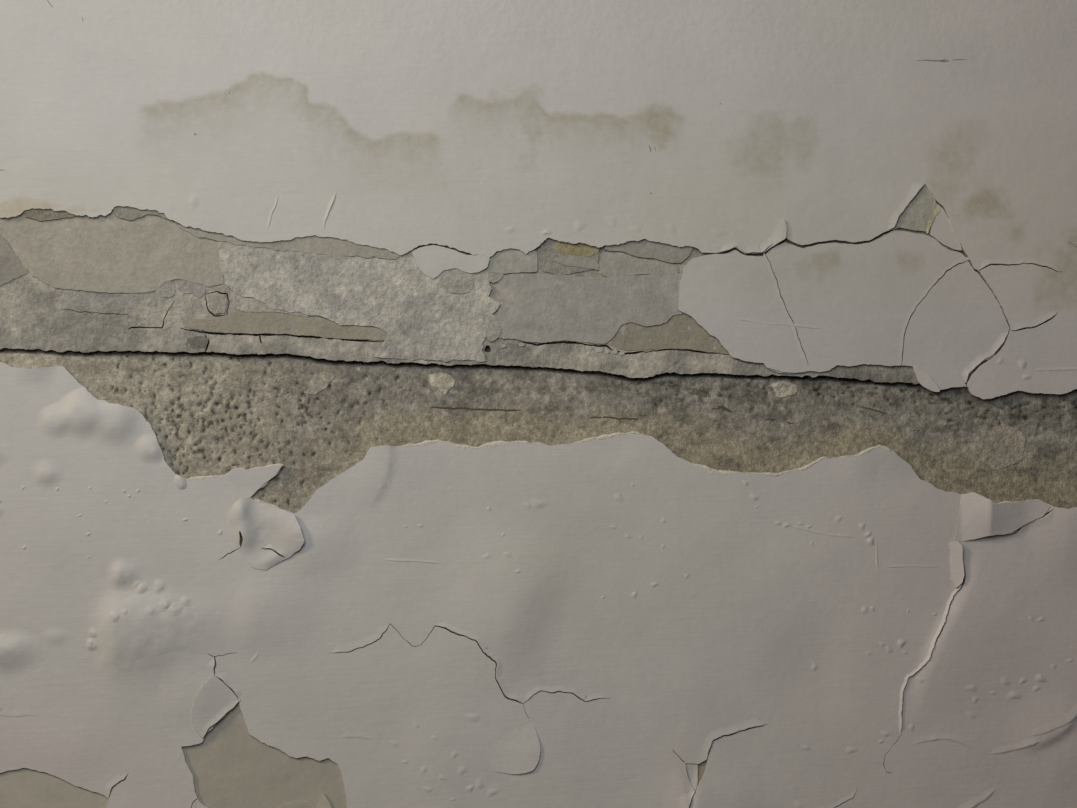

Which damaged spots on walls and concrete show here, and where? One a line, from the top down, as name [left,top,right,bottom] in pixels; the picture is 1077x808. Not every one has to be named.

crack [714,230,893,366]
flaking render [887,185,964,280]
crack [899,250,1063,384]
flaking render [0,206,1077,588]
crack [1010,509,1054,540]
crack [330,622,610,717]
crack [898,571,965,735]
peeling [0,768,119,808]
peeling [182,675,347,808]
crack [674,718,768,762]